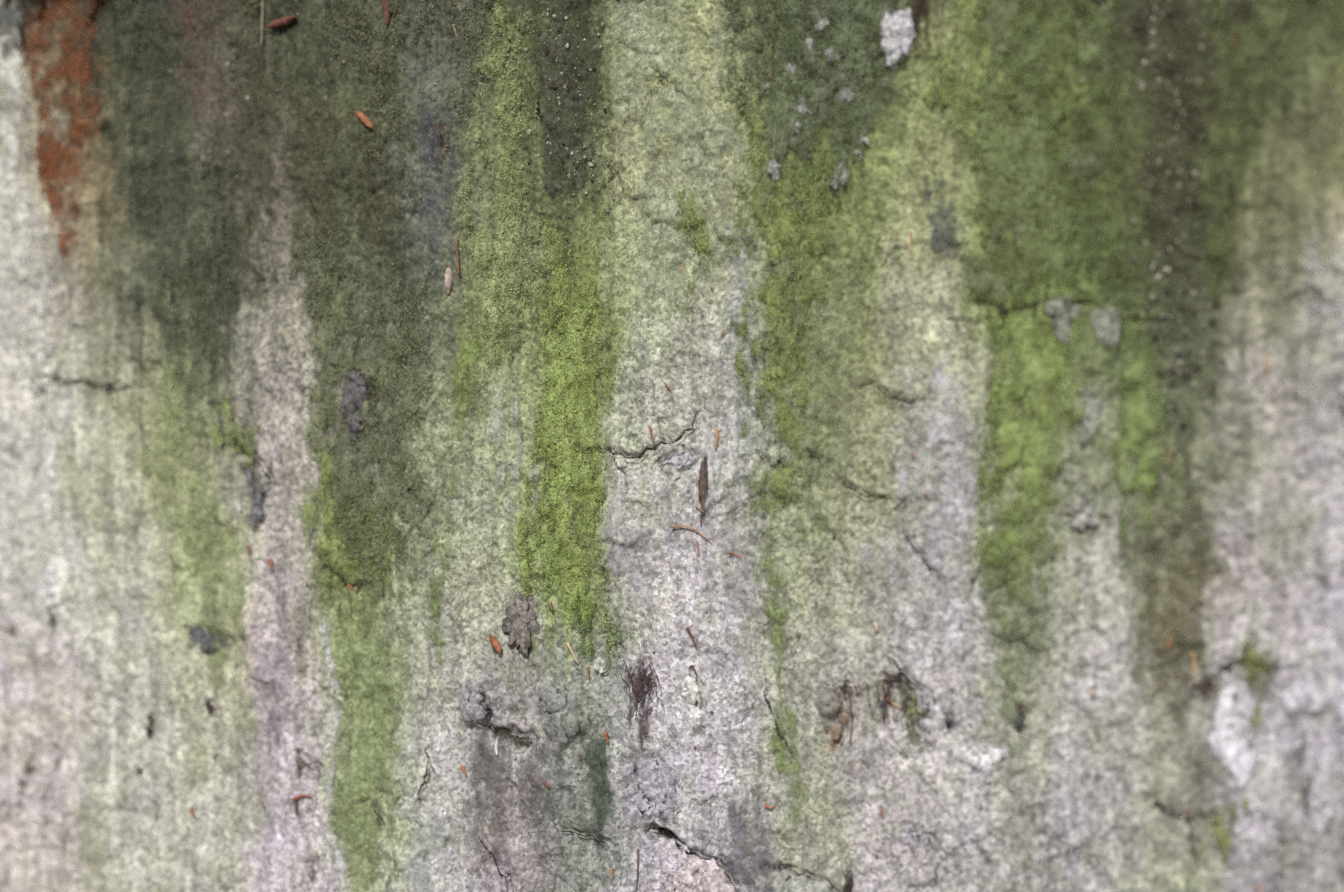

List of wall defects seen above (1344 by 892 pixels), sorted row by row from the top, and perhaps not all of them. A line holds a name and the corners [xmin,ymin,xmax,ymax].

water stain [0,0,56,673]
rust [24,0,100,255]
crack [44,371,131,392]
water stain [91,0,279,686]
water stain [289,80,416,333]
water stain [535,0,597,197]
crack [595,408,701,470]
water stain [613,0,763,482]
water stain [428,536,447,666]
water stain [1136,508,1219,716]
crack [643,825,734,886]
crack [767,861,850,892]